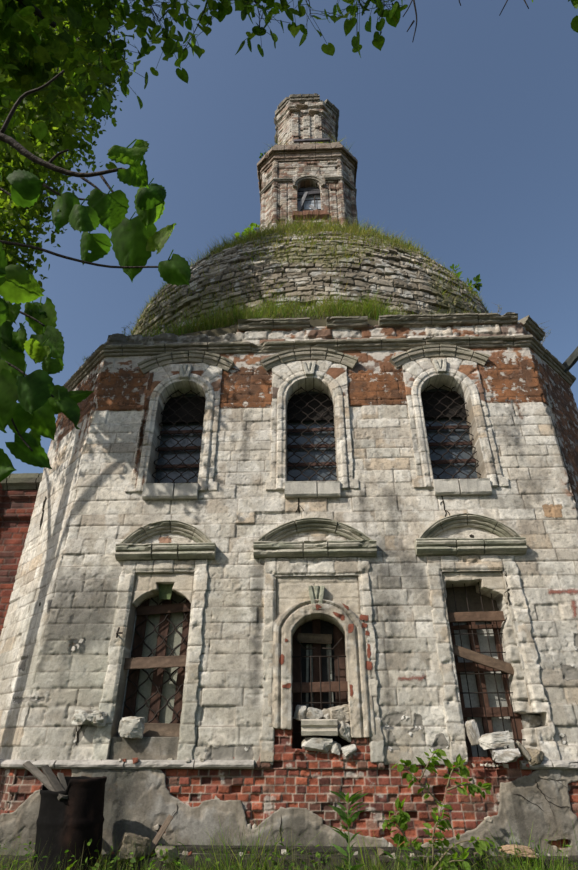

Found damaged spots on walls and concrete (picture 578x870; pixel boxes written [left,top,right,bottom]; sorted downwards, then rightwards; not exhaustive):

spalling [542,504,562,518]
peeling [382,710,424,751]
flaking render [0,768,72,815]
flaking render [161,728,536,847]
crack [515,778,572,815]
flaking render [568,781,578,817]
flaking render [548,839,568,853]